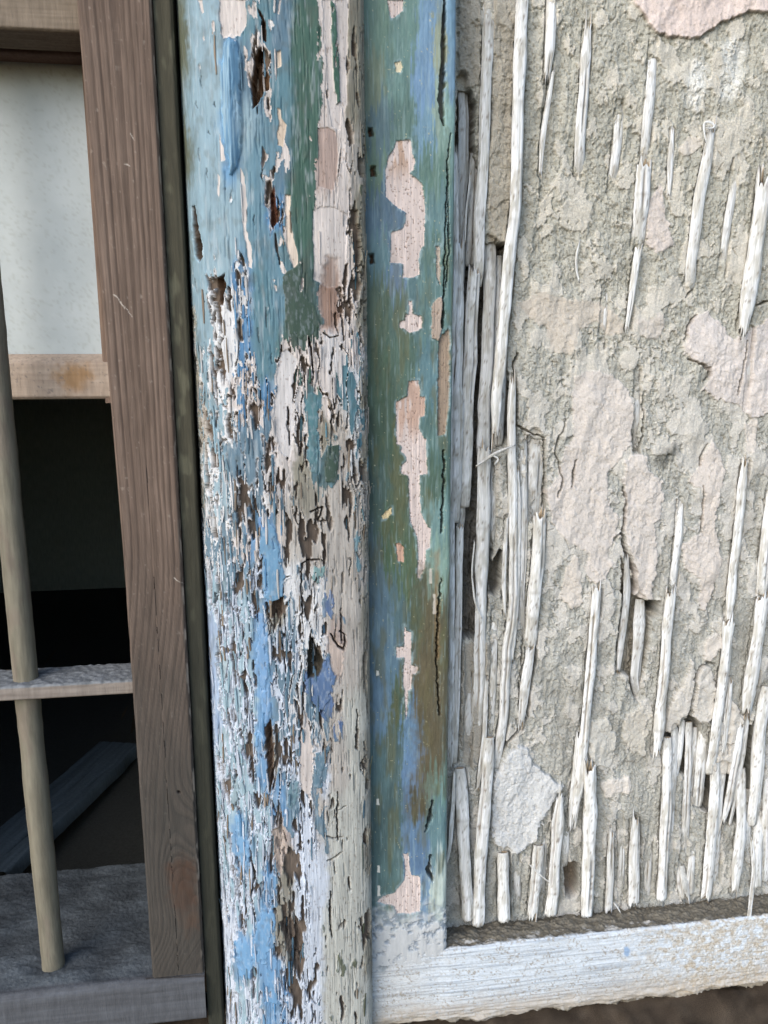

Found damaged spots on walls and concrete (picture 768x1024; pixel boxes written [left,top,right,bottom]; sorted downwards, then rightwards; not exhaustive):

peeling [633,0,768,40]
peeling [360,108,441,285]
peeling [176,0,375,1024]
peeling [396,380,431,579]
crack [511,352,578,514]
peeling [454,0,666,798]
crack [613,486,639,600]
crack [632,394,647,455]
peeling [683,311,768,454]
peeling [396,628,418,718]
peeling [662,633,749,827]
crack [424,799,435,883]